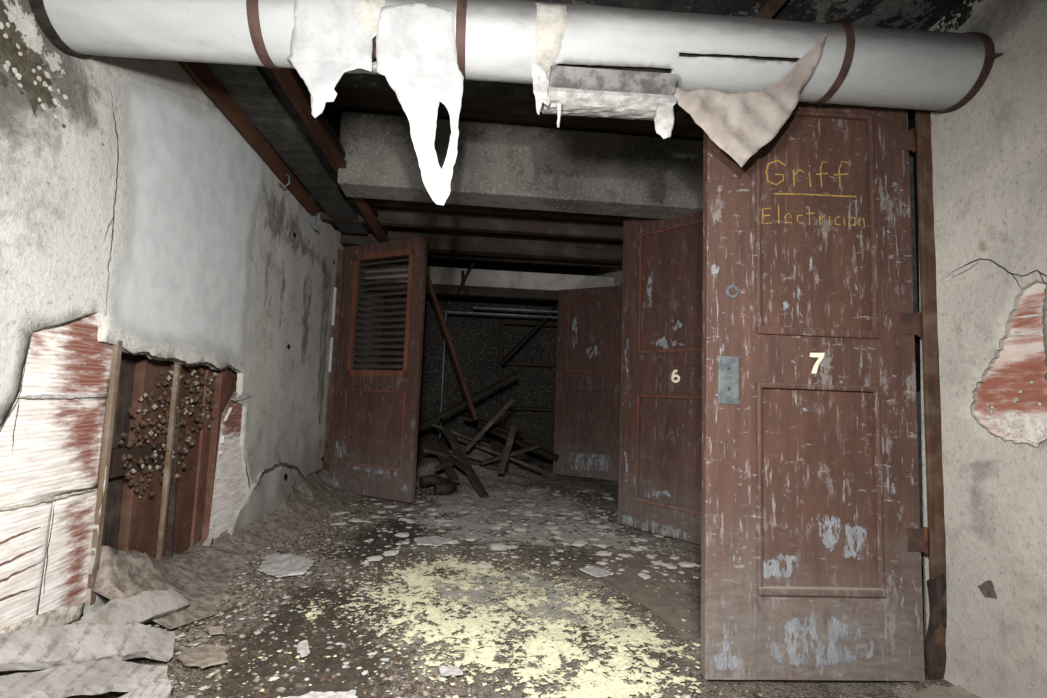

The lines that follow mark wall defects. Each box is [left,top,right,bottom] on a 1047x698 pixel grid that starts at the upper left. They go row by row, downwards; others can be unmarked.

spalling [970,279,1047,447]
spalling [0,312,253,634]
peeling [178,593,243,647]
peeling [248,548,716,698]